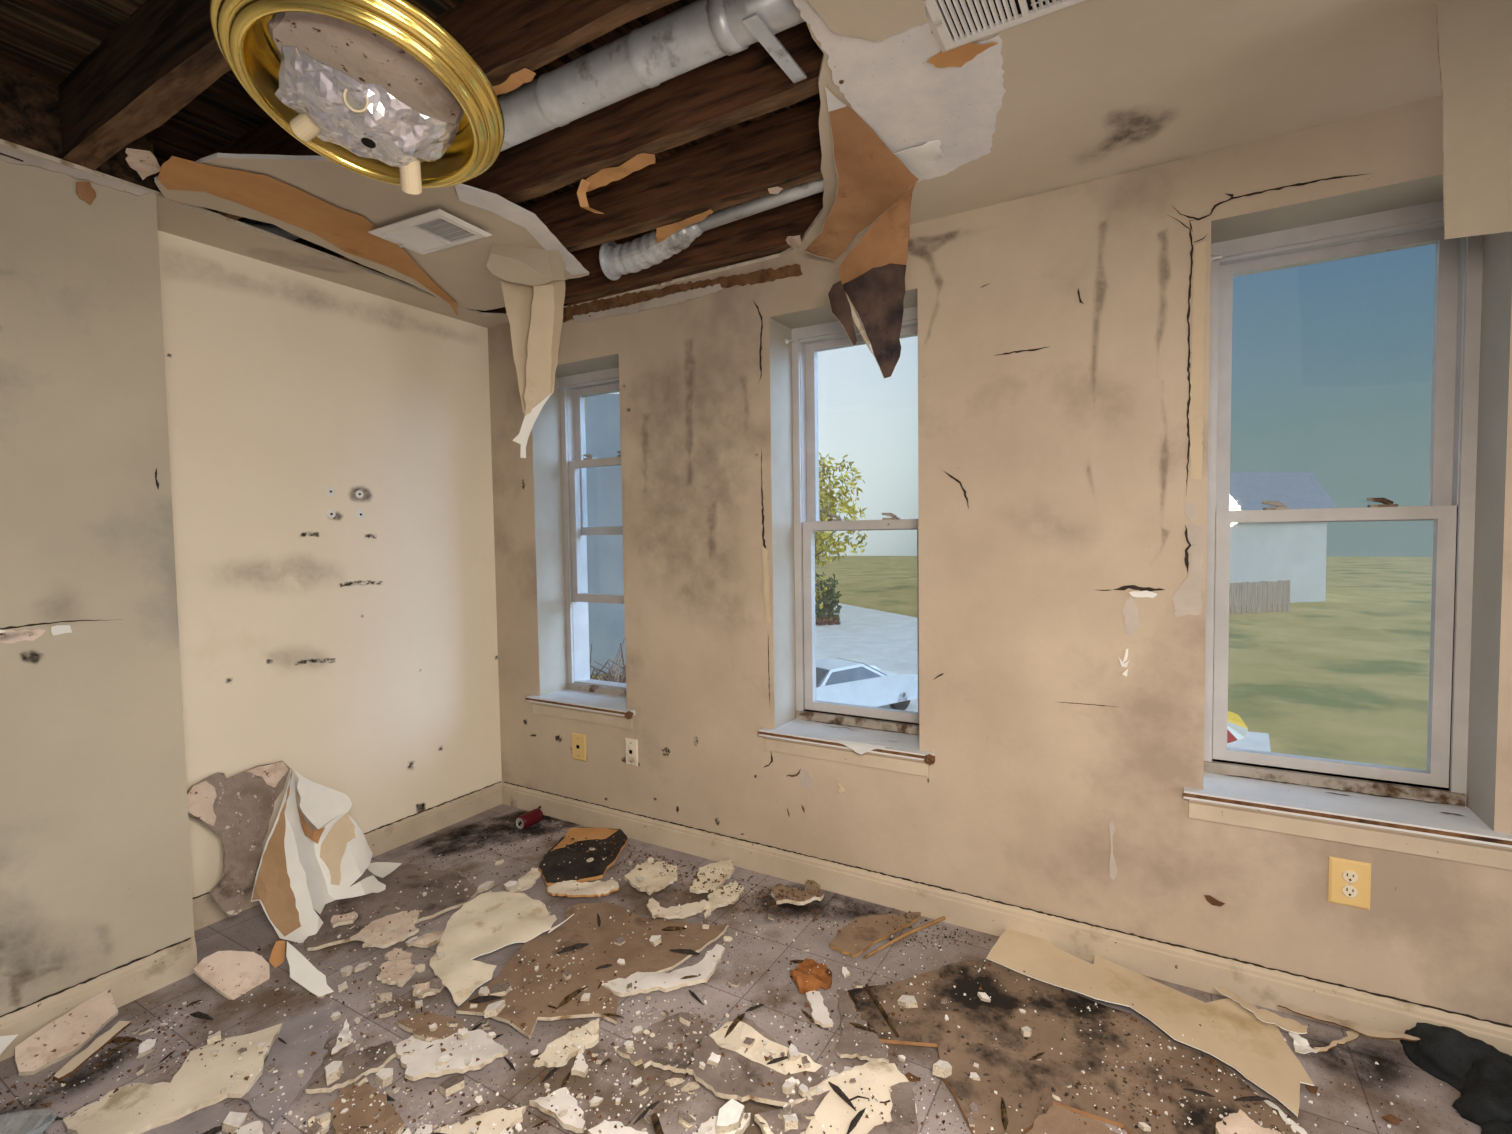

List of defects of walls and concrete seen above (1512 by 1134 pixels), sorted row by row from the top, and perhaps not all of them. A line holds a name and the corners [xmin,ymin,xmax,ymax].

flaking render [793,0,1006,182]
crack [1168,173,1373,496]
crack [1100,585,1165,598]
spalling [1171,524,1205,617]
peeling [0,629,46,643]
crack [0,620,108,636]
spalling [187,781,217,826]